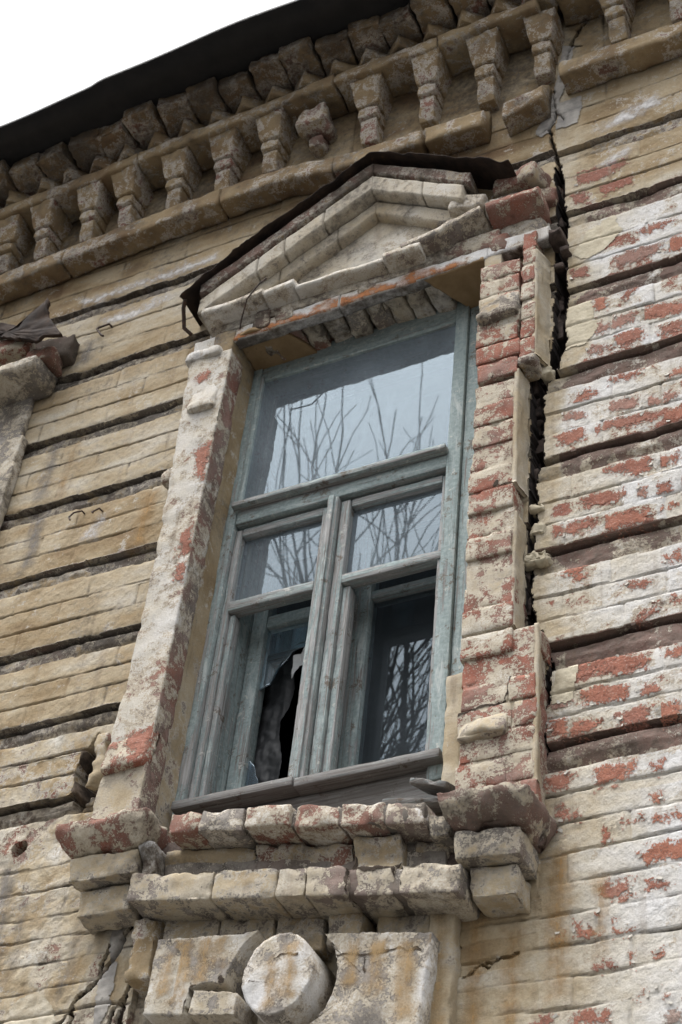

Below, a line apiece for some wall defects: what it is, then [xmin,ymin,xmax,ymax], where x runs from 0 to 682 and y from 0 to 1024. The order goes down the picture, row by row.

peeling [570,156,635,212]
peeling [610,217,682,269]
peeling [581,287,682,355]
crack [469,135,570,632]
peeling [549,364,682,447]
peeling [550,447,682,541]
peeling [171,521,194,584]
peeling [620,578,678,631]
crack [544,658,556,756]
peeling [546,643,682,748]
spalling [71,751,96,808]
peeling [543,756,682,849]